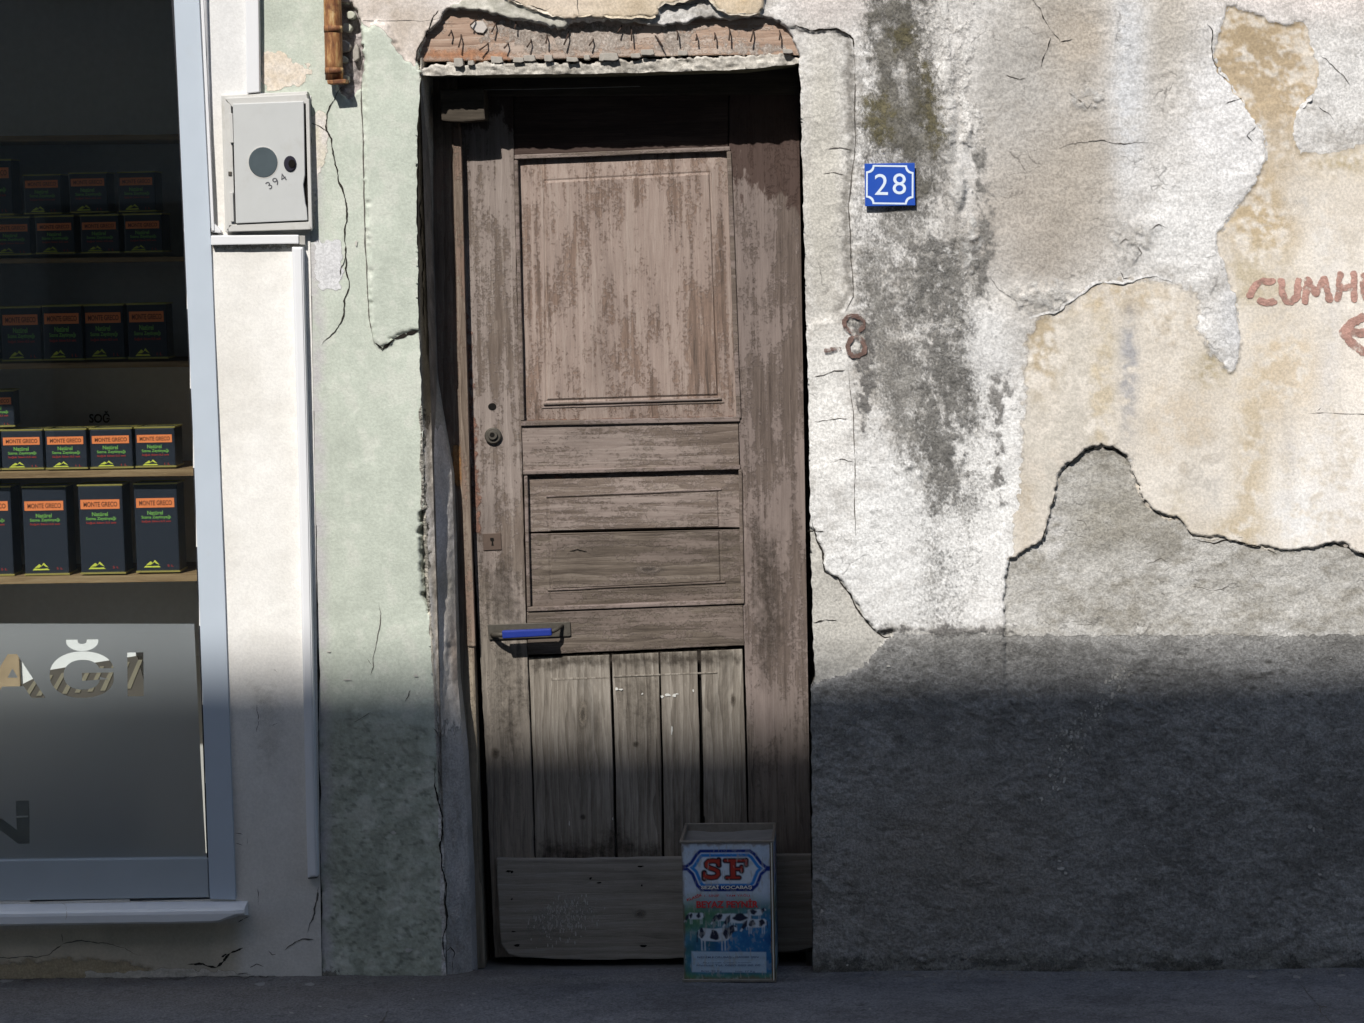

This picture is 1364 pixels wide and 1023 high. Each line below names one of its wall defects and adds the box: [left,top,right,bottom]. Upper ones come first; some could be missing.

crack [312,11,438,344]
peeling [338,0,764,99]
water stain [848,0,996,640]
peeling [911,0,985,146]
peeling [927,246,973,367]
peeling [1003,6,1364,637]